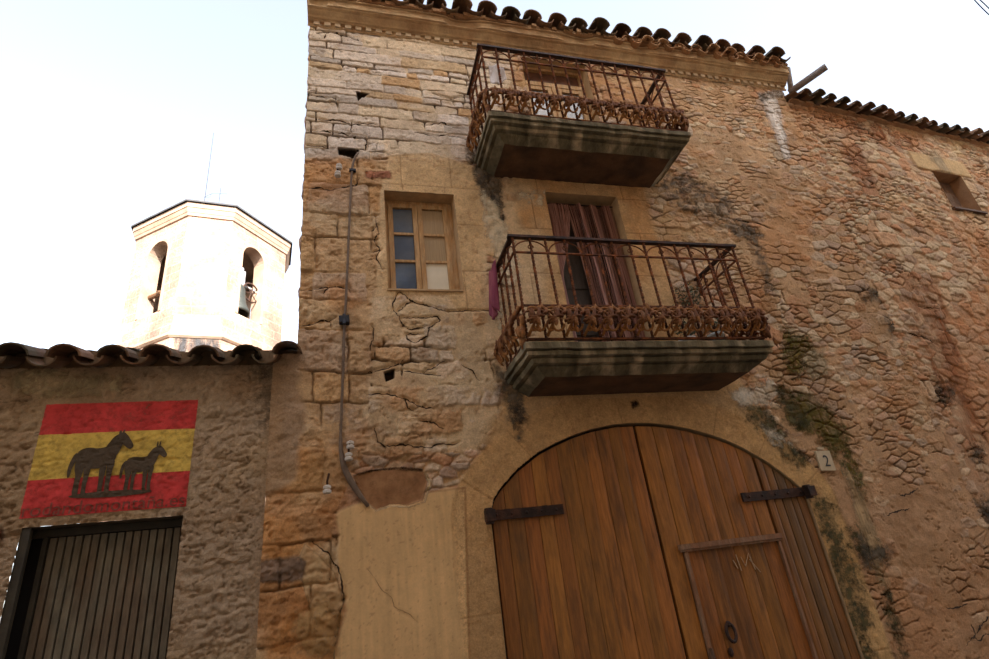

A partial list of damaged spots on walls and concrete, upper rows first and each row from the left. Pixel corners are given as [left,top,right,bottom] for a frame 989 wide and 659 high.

crack [372,216,383,270]
leakage [465,152,521,329]
leakage [174,338,220,352]
leakage [494,366,527,440]
leakage [732,378,811,471]
leakage [802,351,830,381]
leakage [837,438,910,659]
crack [312,541,344,658]